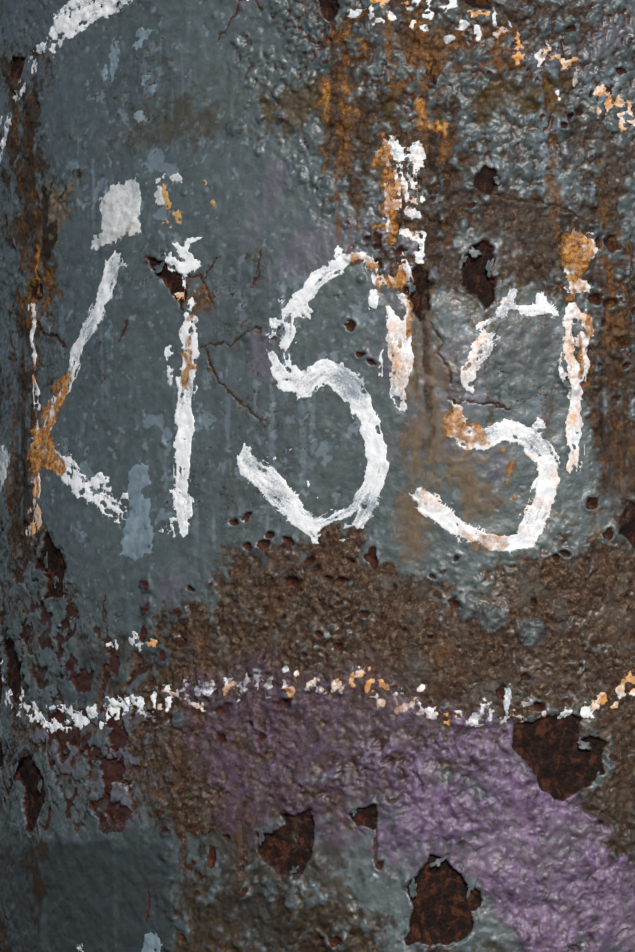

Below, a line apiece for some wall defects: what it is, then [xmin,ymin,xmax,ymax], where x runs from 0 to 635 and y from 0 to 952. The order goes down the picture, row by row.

rust [0,47,82,565]
crack [200,326,266,421]
rust [127,0,635,896]
spalling [0,629,21,703]
spalling [0,742,46,832]
spalling [512,702,608,801]
spalling [257,809,315,875]
spalling [405,854,482,945]